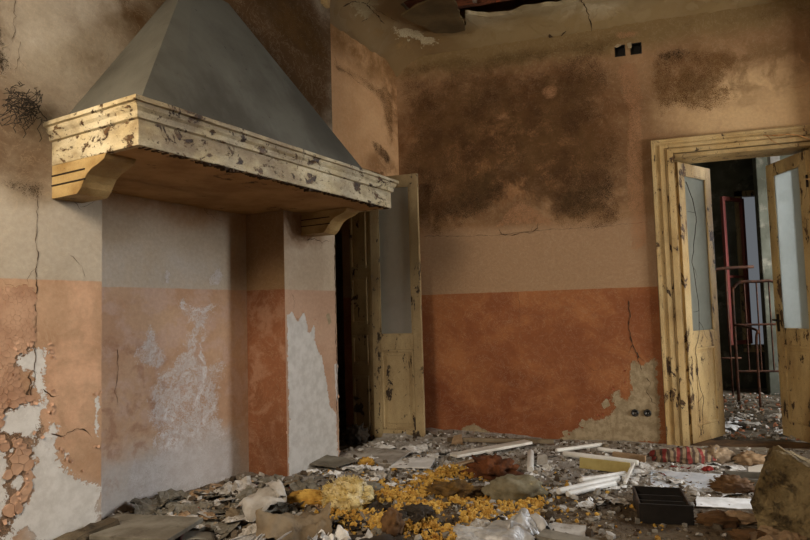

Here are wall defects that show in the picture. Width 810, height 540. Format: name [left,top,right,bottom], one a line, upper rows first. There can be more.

peeling [394,27,439,45]
leakage [334,34,628,236]
leakage [649,46,749,116]
crack [3,200,59,397]
peeling [0,284,103,540]
leakage [125,295,244,499]
peeling [286,310,340,476]
spalling [561,355,666,444]
crack [628,301,656,404]